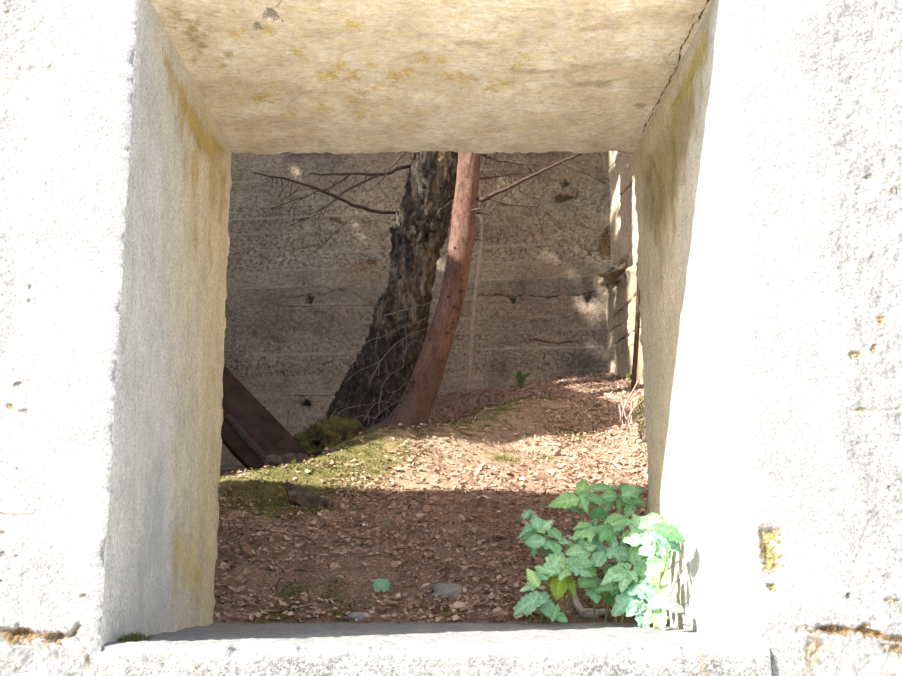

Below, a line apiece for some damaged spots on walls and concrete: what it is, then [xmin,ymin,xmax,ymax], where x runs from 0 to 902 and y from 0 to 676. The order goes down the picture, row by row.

crack [0,625,90,660]
crack [790,579,902,664]